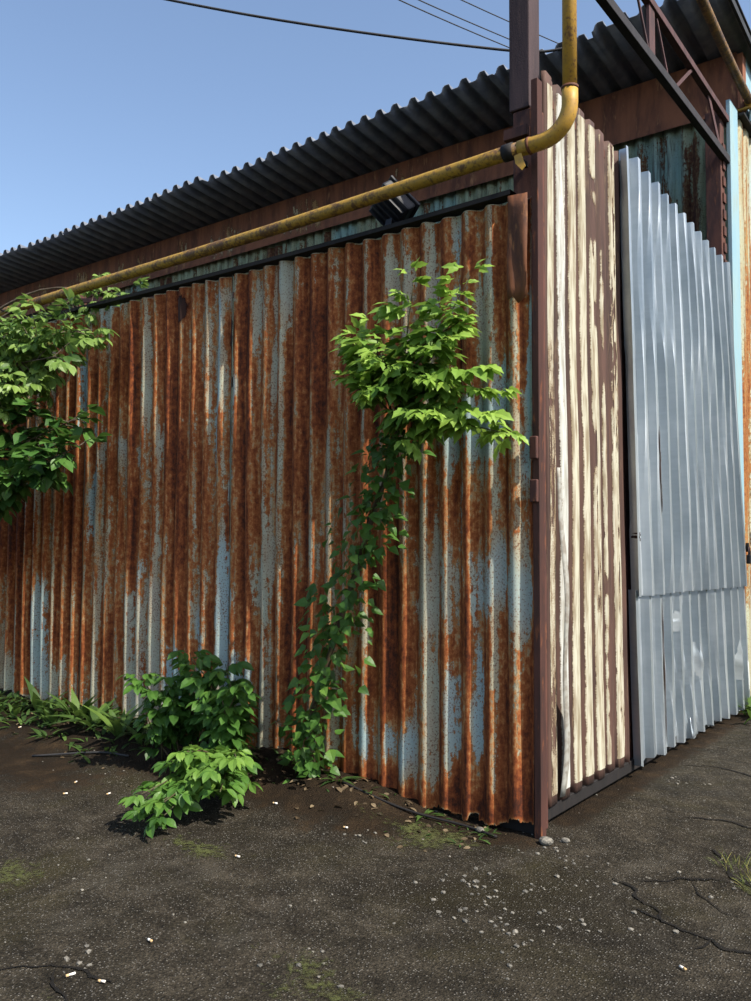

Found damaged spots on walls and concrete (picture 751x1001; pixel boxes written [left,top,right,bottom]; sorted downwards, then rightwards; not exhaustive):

peeling [547,83,562,130]
corrosion [637,129,704,231]
corrosion [739,124,751,609]
corrosion [0,181,534,826]
peeling [547,115,625,795]
crack [613,847,751,954]
crack [0,964,113,1001]